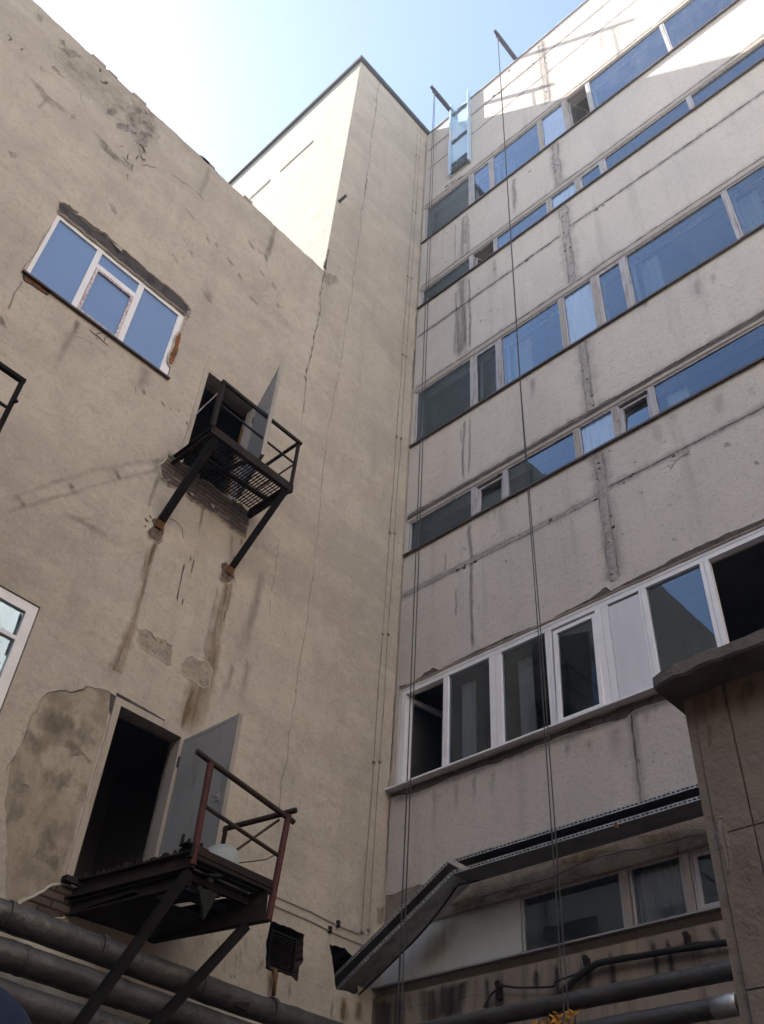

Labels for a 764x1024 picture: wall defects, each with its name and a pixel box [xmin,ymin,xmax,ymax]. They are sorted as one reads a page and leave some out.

spalling [56,202,191,367]
flaking render [158,454,251,538]